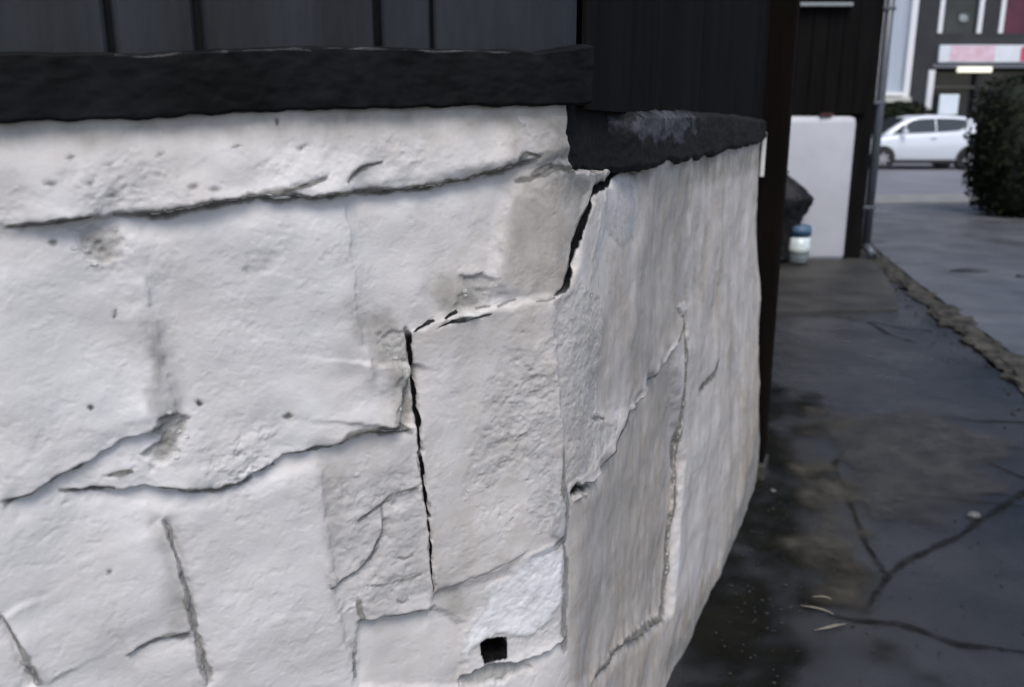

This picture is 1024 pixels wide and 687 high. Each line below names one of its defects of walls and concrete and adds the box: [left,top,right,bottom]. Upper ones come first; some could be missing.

crack [5,217,90,228]
crack [5,464,133,504]
crack [126,151,639,681]
crack [832,455,1024,652]